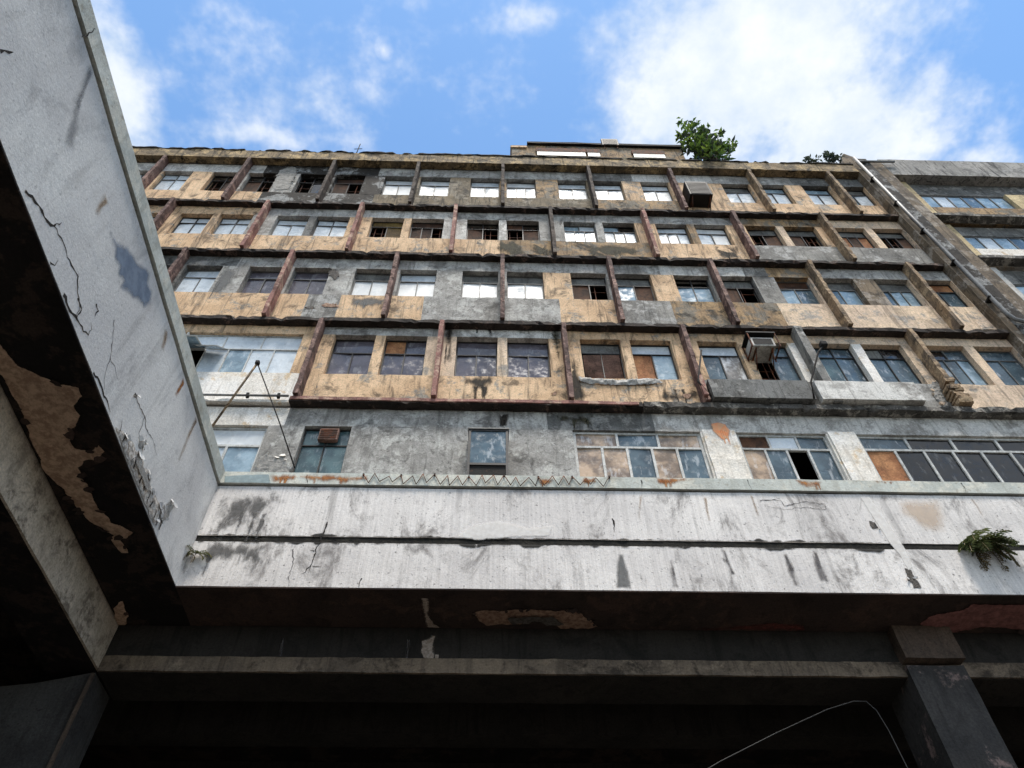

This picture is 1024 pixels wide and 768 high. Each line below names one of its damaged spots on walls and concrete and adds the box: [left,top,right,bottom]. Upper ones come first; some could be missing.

crack [25,190,117,410]
water stain [116,244,151,305]
water stain [466,378,492,399]
spalling [0,345,133,553]
spalling [116,424,178,530]
corrosion [274,475,366,484]
water stain [198,498,339,574]
crack [288,522,328,579]
spalling [114,601,129,625]
spalling [472,608,601,629]
spalling [920,604,1024,635]